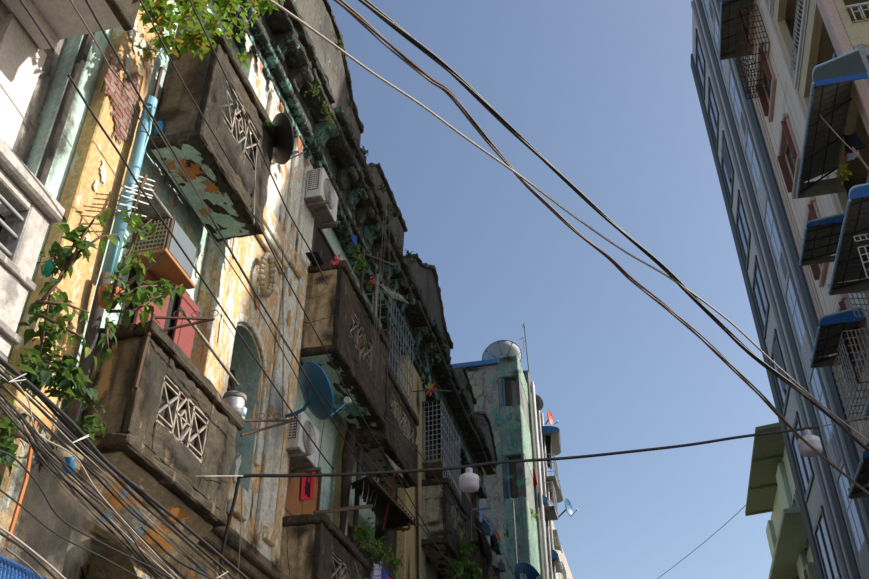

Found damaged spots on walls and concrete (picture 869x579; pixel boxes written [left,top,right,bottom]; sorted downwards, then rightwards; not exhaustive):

spalling [101,17,147,144]
peeling [152,157,220,210]
peeling [184,205,213,241]
peeling [218,238,238,302]
spalling [467,370,487,399]
peeling [101,480,189,553]